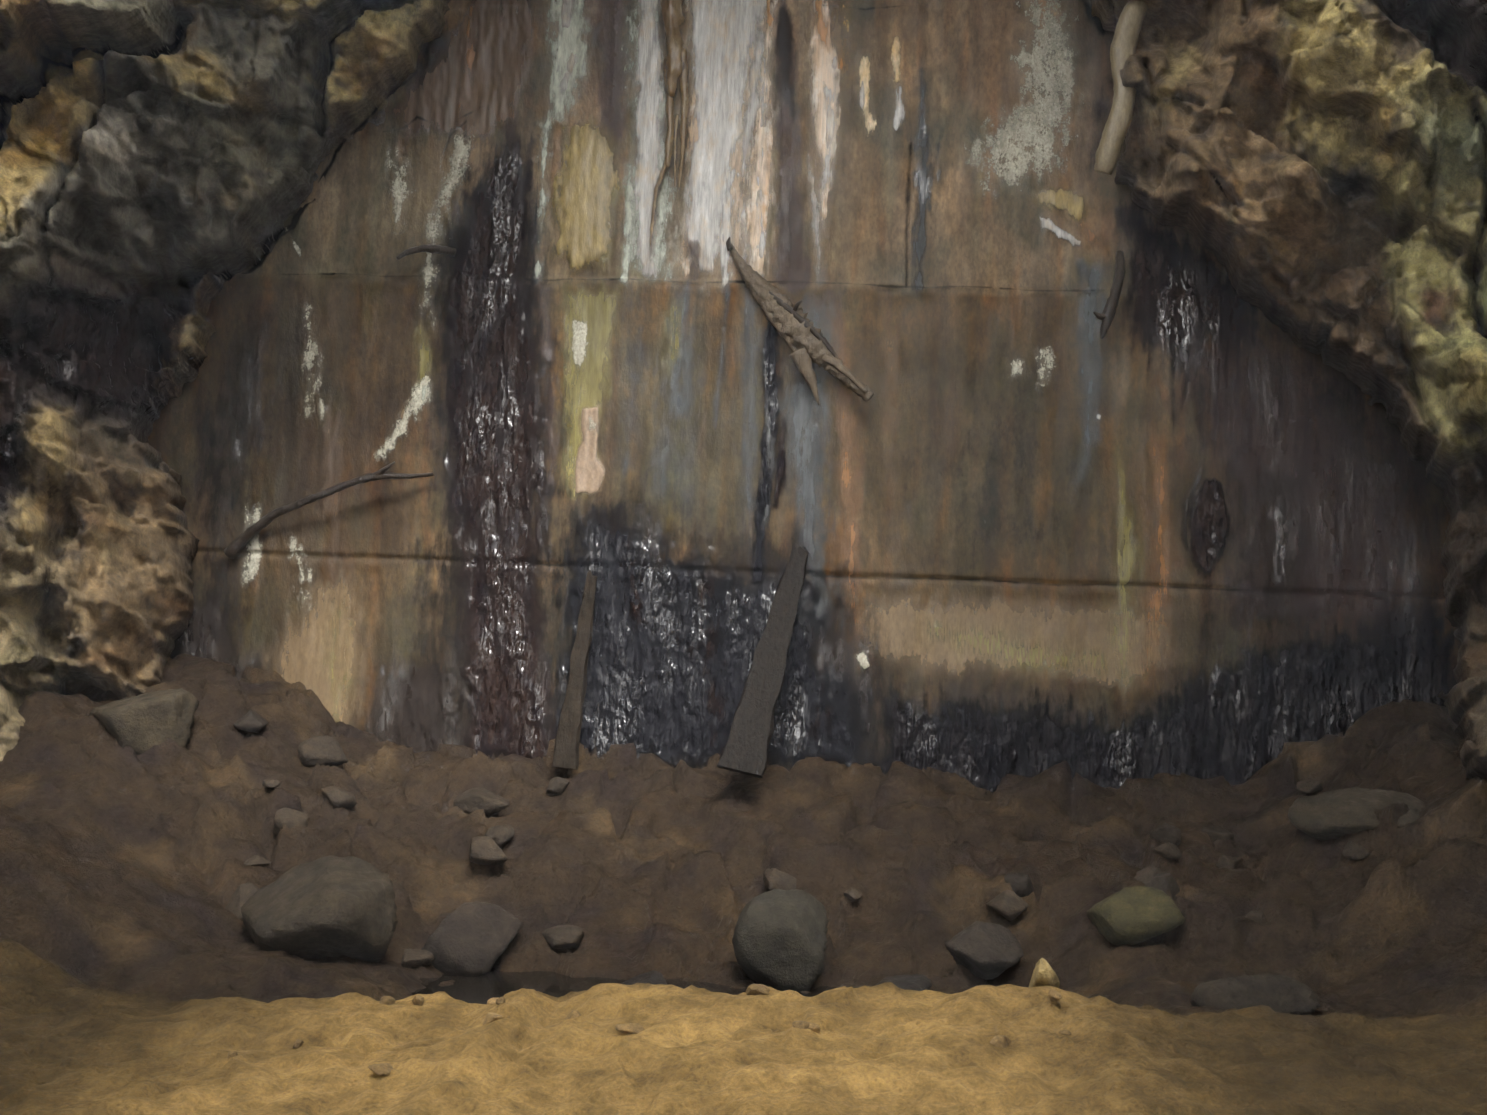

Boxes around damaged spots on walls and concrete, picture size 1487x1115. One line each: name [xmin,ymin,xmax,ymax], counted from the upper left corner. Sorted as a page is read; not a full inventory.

leakage [170,312,272,680]
leakage [366,0,1456,793]